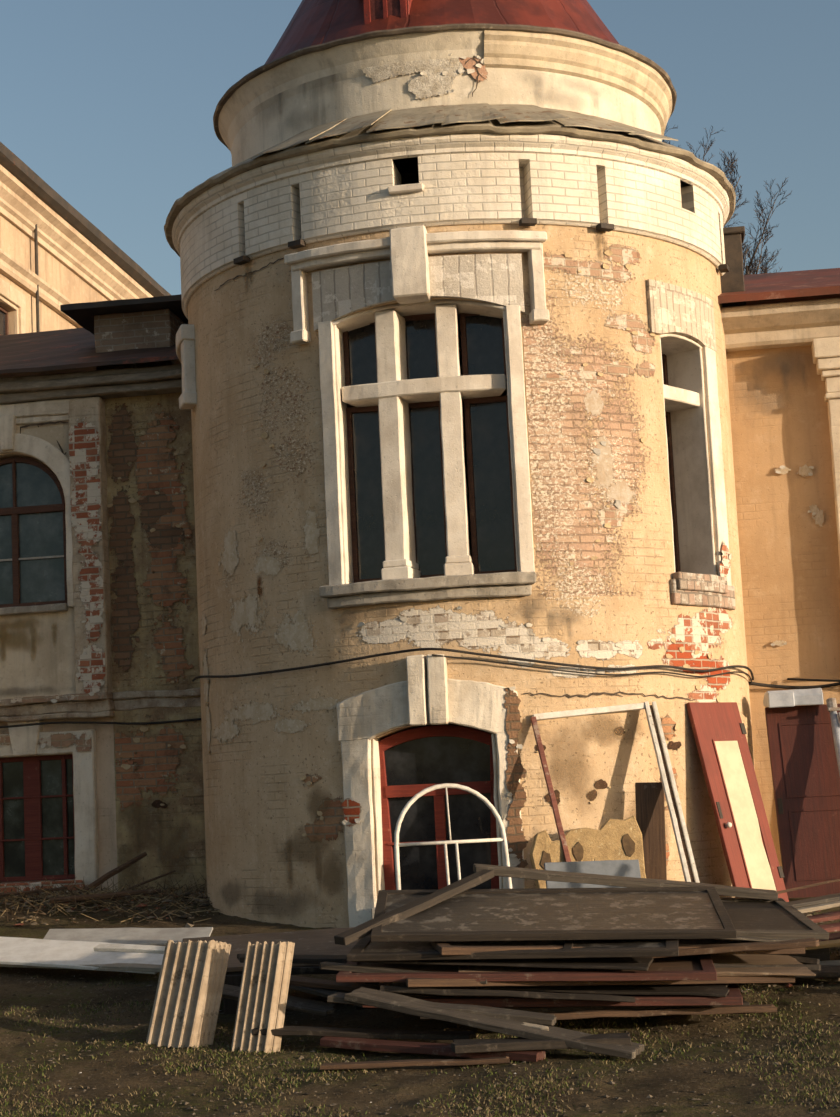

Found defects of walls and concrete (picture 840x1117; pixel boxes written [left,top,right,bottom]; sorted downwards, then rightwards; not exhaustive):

peeling [358,53,488,99]
flaking render [522,244,659,622]
flaking render [775,464,814,477]
flaking render [0,403,185,704]
flaking render [720,542,732,578]
flaking render [355,605,732,702]
flaking render [37,732,92,752]
flaking render [115,714,186,812]
flaking render [302,793,362,844]
flaking render [504,686,528,868]